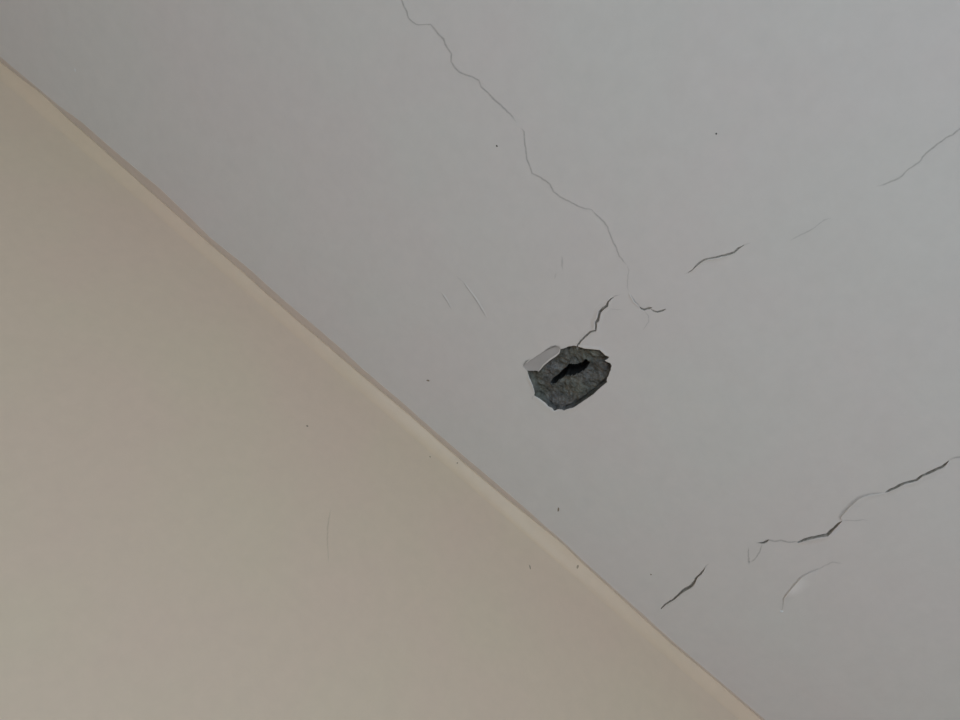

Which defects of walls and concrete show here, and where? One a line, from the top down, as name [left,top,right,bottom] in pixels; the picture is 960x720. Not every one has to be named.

crack [688,245,744,273]
crack [576,294,666,350]
flaking render [524,345,612,417]
crack [797,461,950,545]
crack [661,568,706,610]